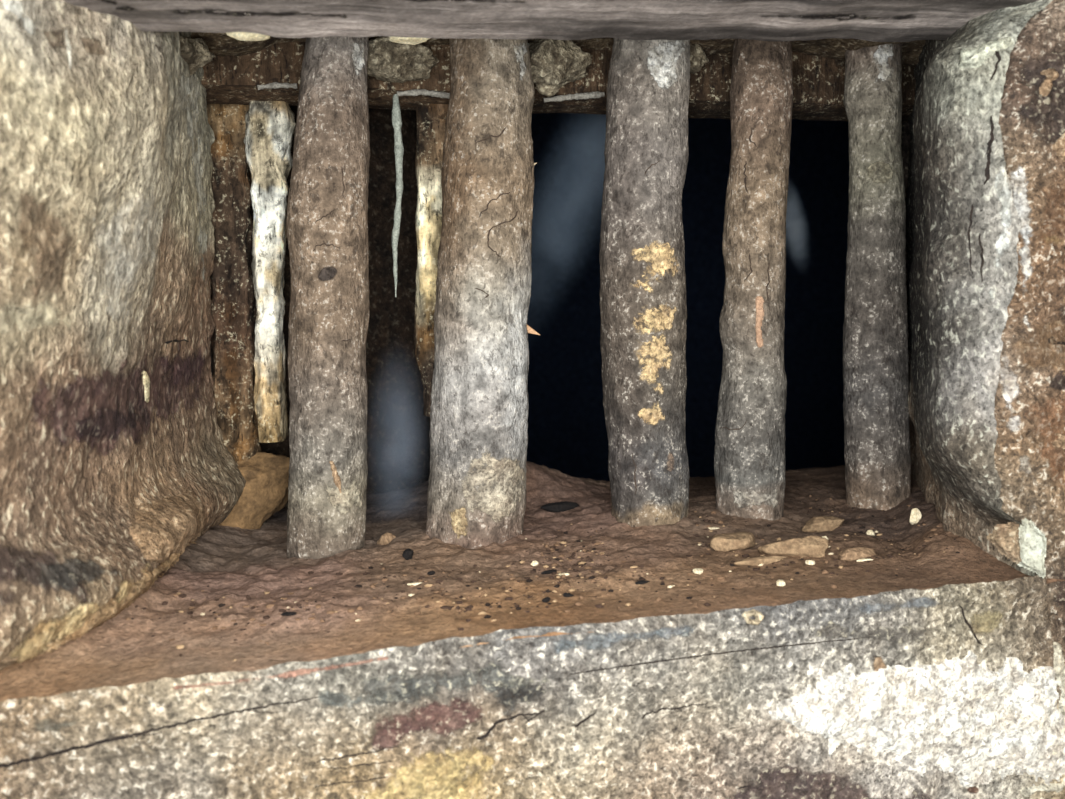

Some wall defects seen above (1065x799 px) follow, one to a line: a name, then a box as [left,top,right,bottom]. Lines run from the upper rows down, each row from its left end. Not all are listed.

water stain [31,341,208,456]
water stain [0,547,118,605]
crack [569,637,869,675]
crack [0,693,339,768]
crack [476,710,546,740]
crack [641,703,708,719]